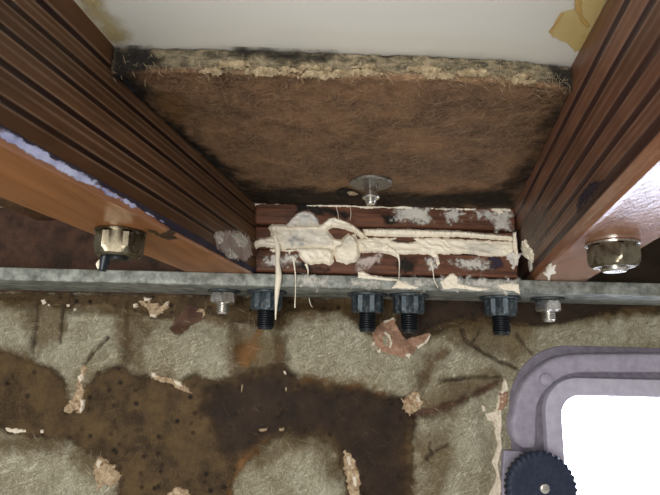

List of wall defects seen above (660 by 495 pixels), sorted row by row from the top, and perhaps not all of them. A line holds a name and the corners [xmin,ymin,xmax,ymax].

damp [549,65,573,90]
damp [112,45,367,206]
damp [375,159,537,208]
damp [0,208,100,270]
damp [107,254,186,272]
spalling [371,317,431,358]
damp [366,299,660,356]
damp [0,290,415,495]